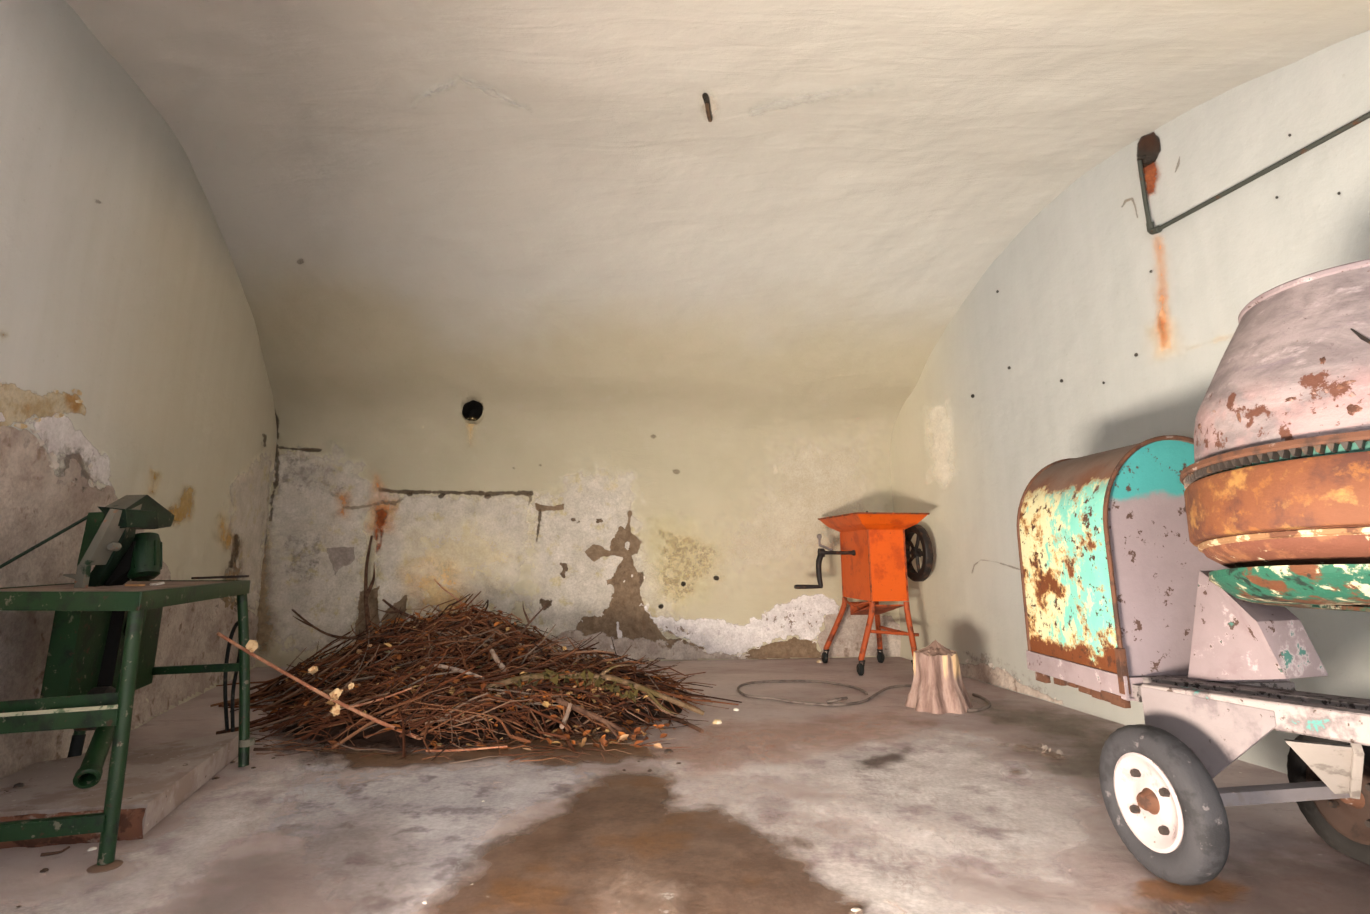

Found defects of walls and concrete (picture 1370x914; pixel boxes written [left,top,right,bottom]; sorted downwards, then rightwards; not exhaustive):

corrosion [1143,162,1158,195]
spalling [0,382,118,588]
corrosion [375,503,388,551]
peeling [130,452,407,731]
spalling [0,611,55,701]
efflorescence [642,594,839,657]
spalling [0,729,95,780]
spalling [0,808,146,849]
leakage [671,734,1081,914]